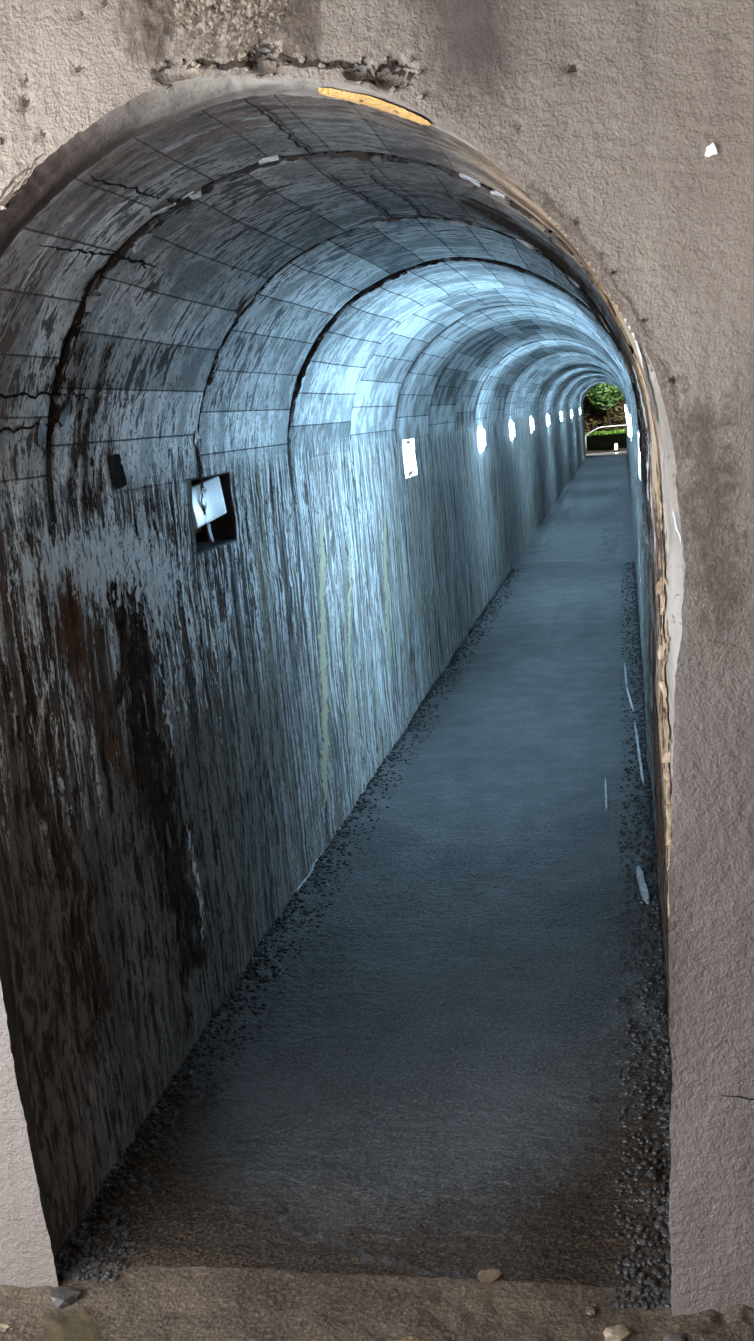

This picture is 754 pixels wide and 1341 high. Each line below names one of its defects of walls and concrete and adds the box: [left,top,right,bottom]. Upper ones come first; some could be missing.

water stain [0,493,199,764]
water stain [187,829,205,940]
peeling [36,151,747,917]
water stain [624,319,672,1065]